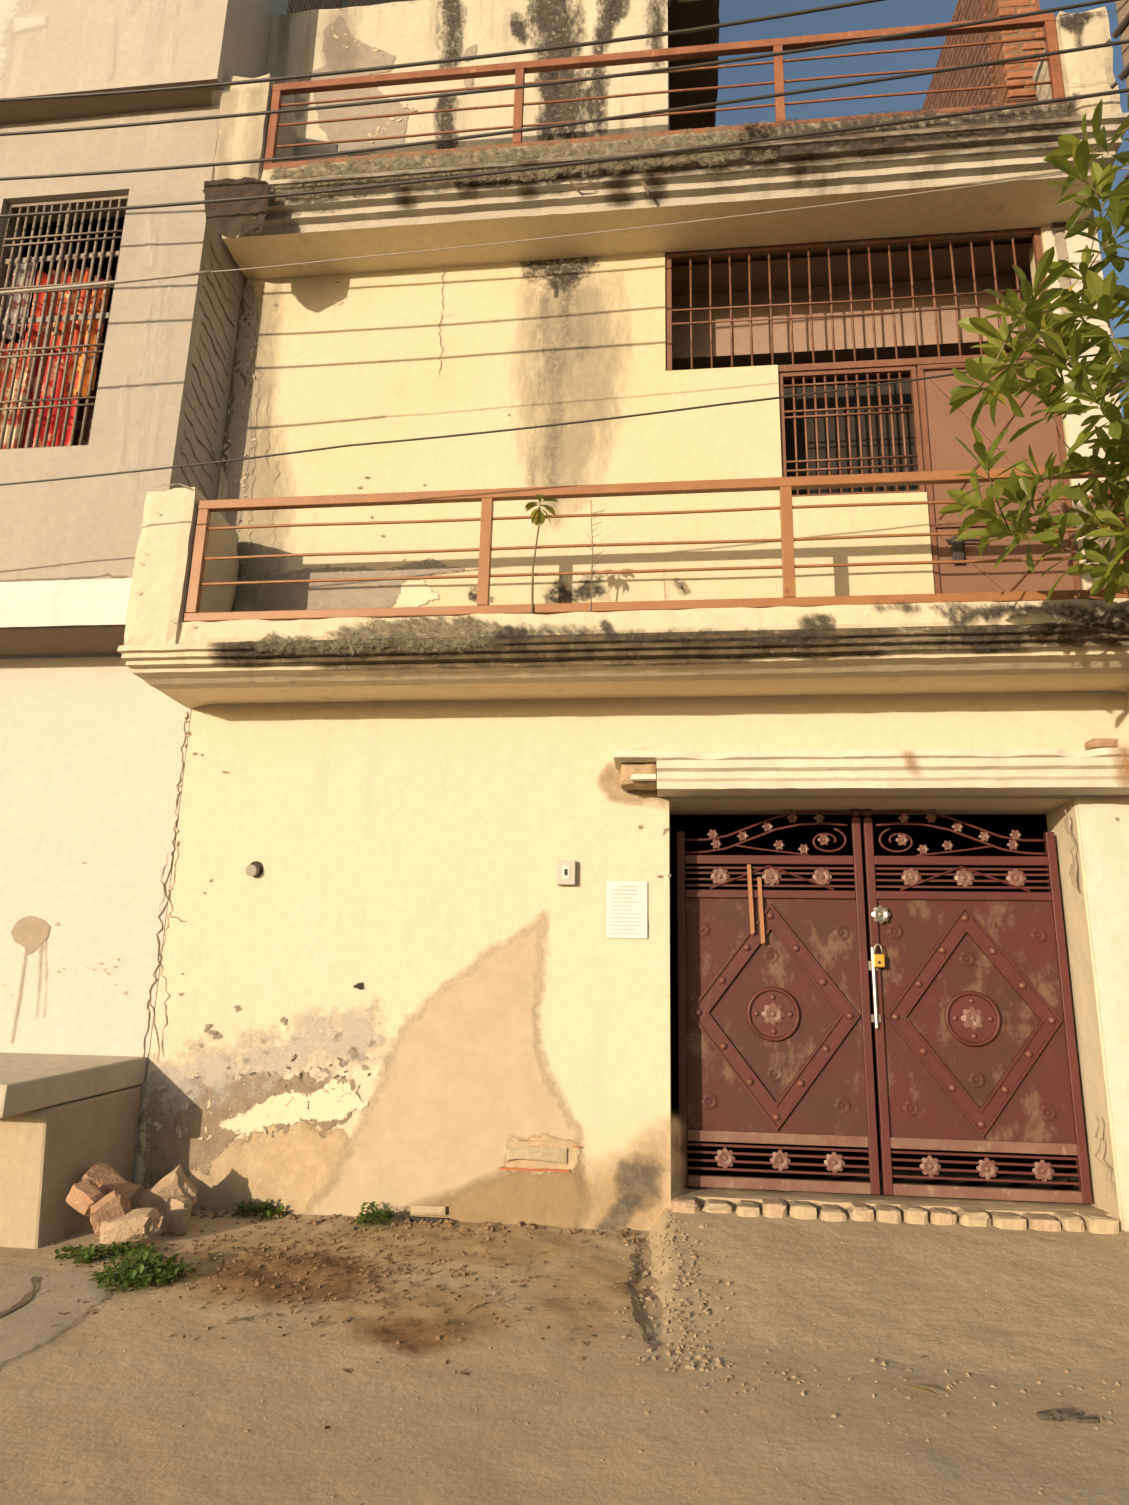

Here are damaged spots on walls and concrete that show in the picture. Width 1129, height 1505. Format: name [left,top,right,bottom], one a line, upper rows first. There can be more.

peeling [294,16,417,157]
water stain [391,0,1079,207]
spalling [204,177,268,239]
water stain [292,172,374,190]
water stain [521,257,597,291]
peeling [255,558,465,611]
water stain [210,602,1129,670]
crack [142,711,189,1062]
peeling [138,1006,383,1215]